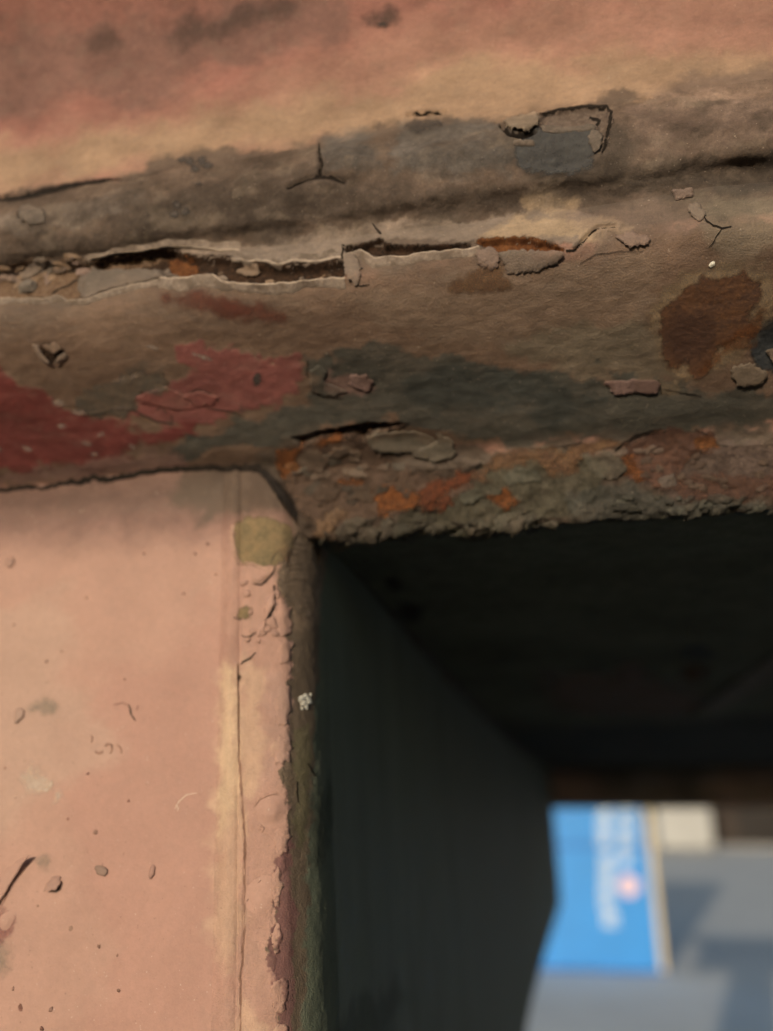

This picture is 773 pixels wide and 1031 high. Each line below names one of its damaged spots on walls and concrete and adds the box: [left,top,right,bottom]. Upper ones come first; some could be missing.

peeling [499,104,614,175]
peeling [236,263,260,277]
peeling [343,253,362,286]
peeling [475,246,564,275]
peeling [580,231,650,264]
peeling [32,342,68,364]
rust [651,263,773,388]
rust [275,421,773,545]
peeling [270,685,293,765]
peeling [0,855,35,941]
peeling [271,827,292,907]
peeling [270,978,289,1031]